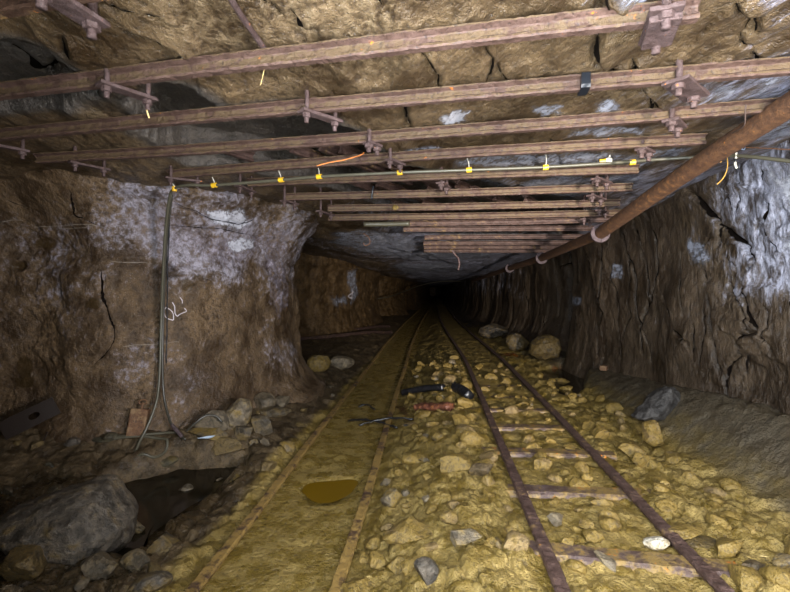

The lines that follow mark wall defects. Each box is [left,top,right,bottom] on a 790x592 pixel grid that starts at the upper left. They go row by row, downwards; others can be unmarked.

crack [485,47,507,82]
leakage [207,208,254,252]
crack [560,224,769,388]